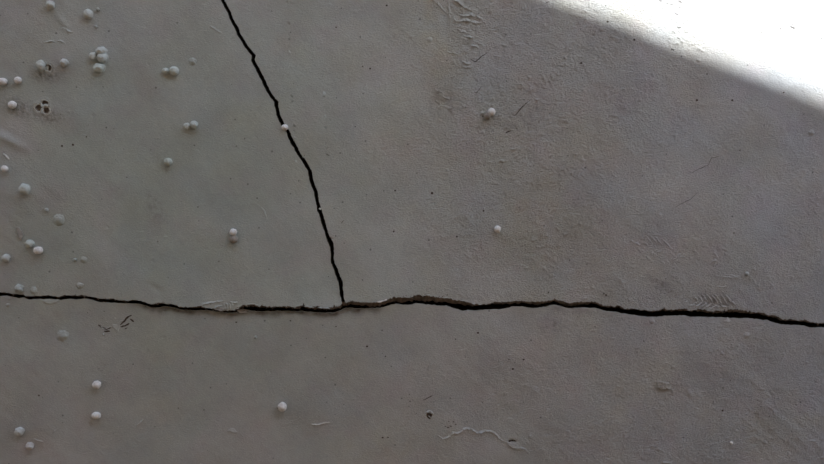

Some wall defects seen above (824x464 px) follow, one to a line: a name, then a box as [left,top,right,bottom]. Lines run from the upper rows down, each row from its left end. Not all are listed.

crack [0,0,824,327]